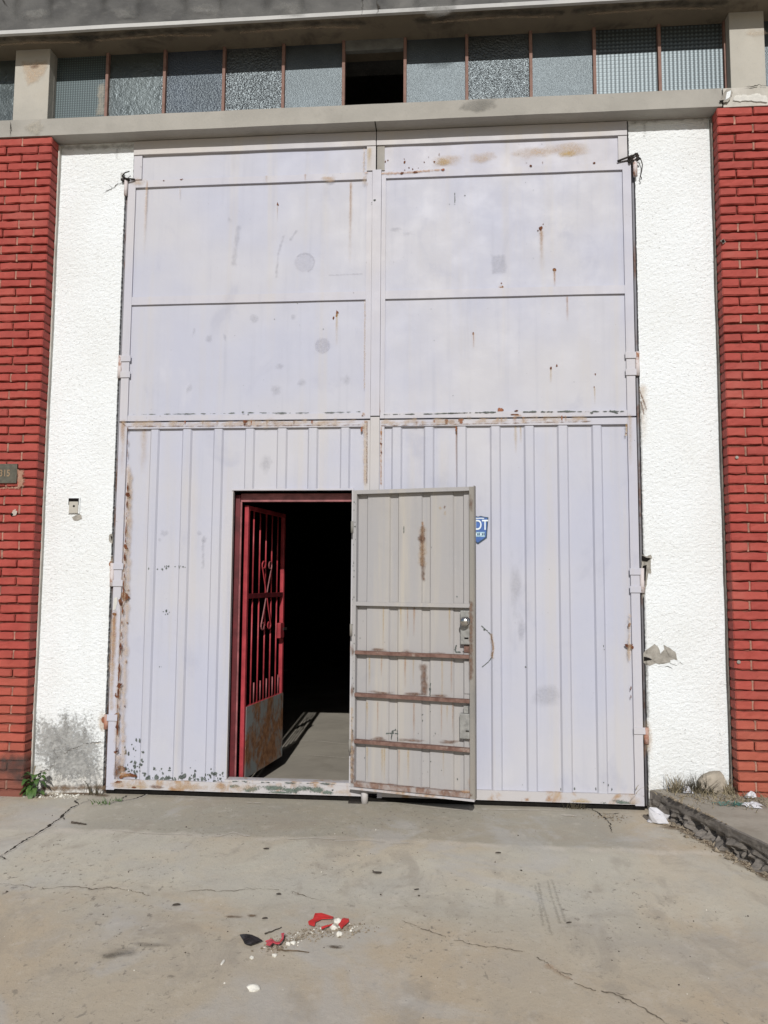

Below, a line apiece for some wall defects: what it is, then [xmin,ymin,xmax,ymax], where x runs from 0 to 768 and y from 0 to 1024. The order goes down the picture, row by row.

rust [100,474,136,788]
flaking render [643,644,680,666]
damp [35,714,107,787]
crack [1,794,147,859]
crack [404,921,661,1019]